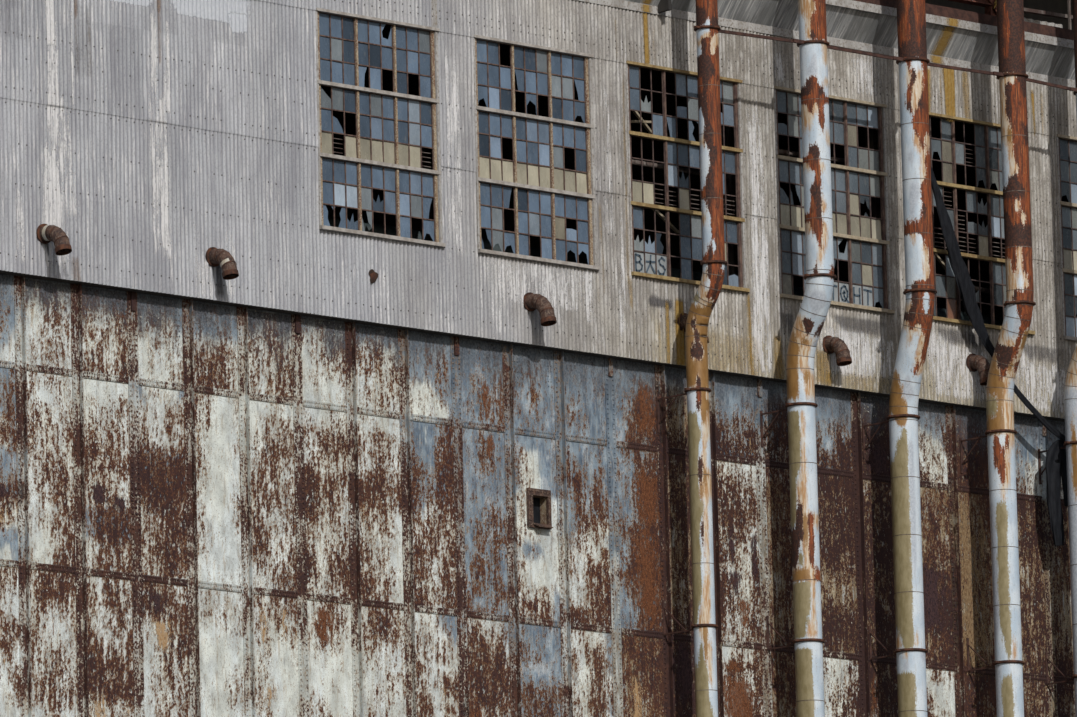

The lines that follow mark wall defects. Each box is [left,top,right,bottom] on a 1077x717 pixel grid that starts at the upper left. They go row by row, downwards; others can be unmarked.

corrosion [0,277,696,717]
corrosion [816,395,898,717]